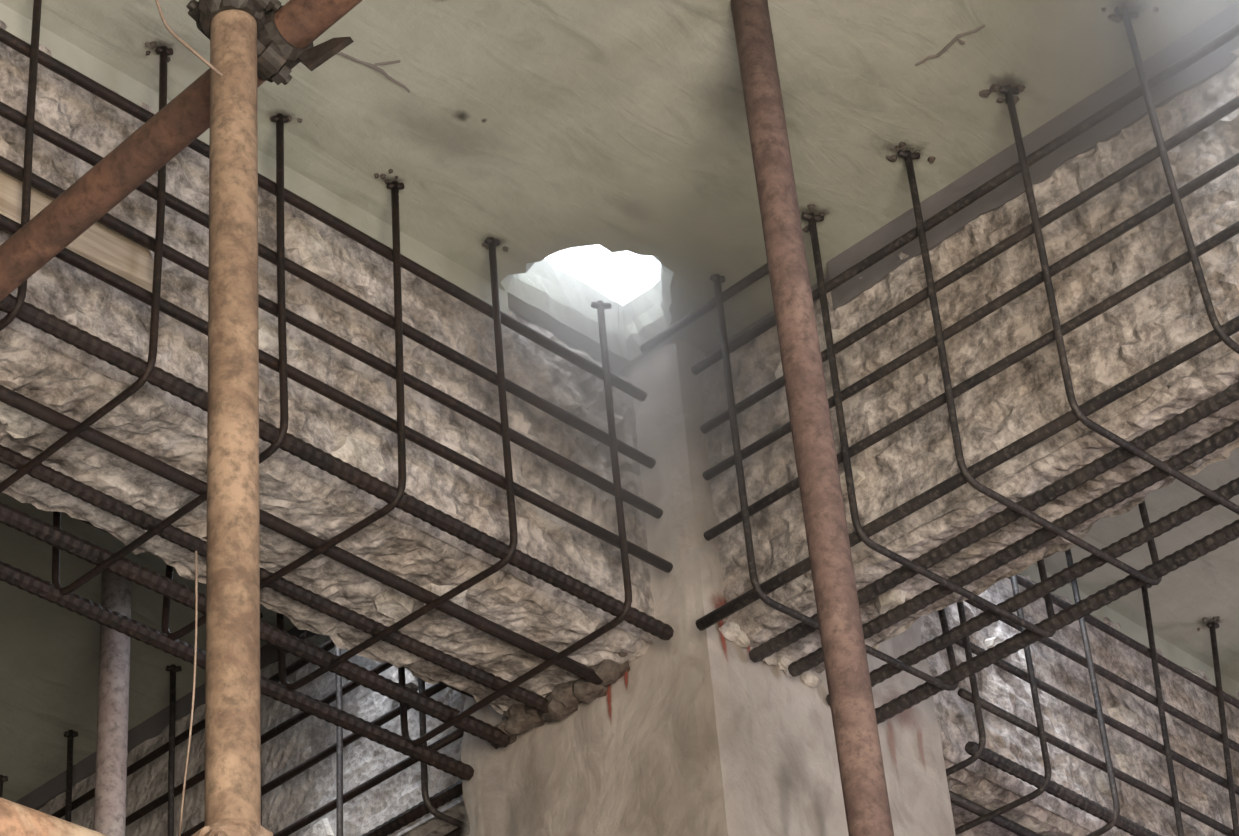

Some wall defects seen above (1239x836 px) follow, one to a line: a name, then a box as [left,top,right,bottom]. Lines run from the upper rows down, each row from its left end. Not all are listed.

spalling [0,20,156,190]
crack [915,24,985,66]
spalling [10,147,209,392]
spalling [0,311,207,584]
spalling [258,186,655,618]
spalling [259,438,655,761]
corrosion [717,598,727,658]
spalling [698,325,825,688]
spalling [814,48,1239,836]
spalling [38,773,95,830]
spalling [125,704,205,836]
spalling [260,693,470,836]